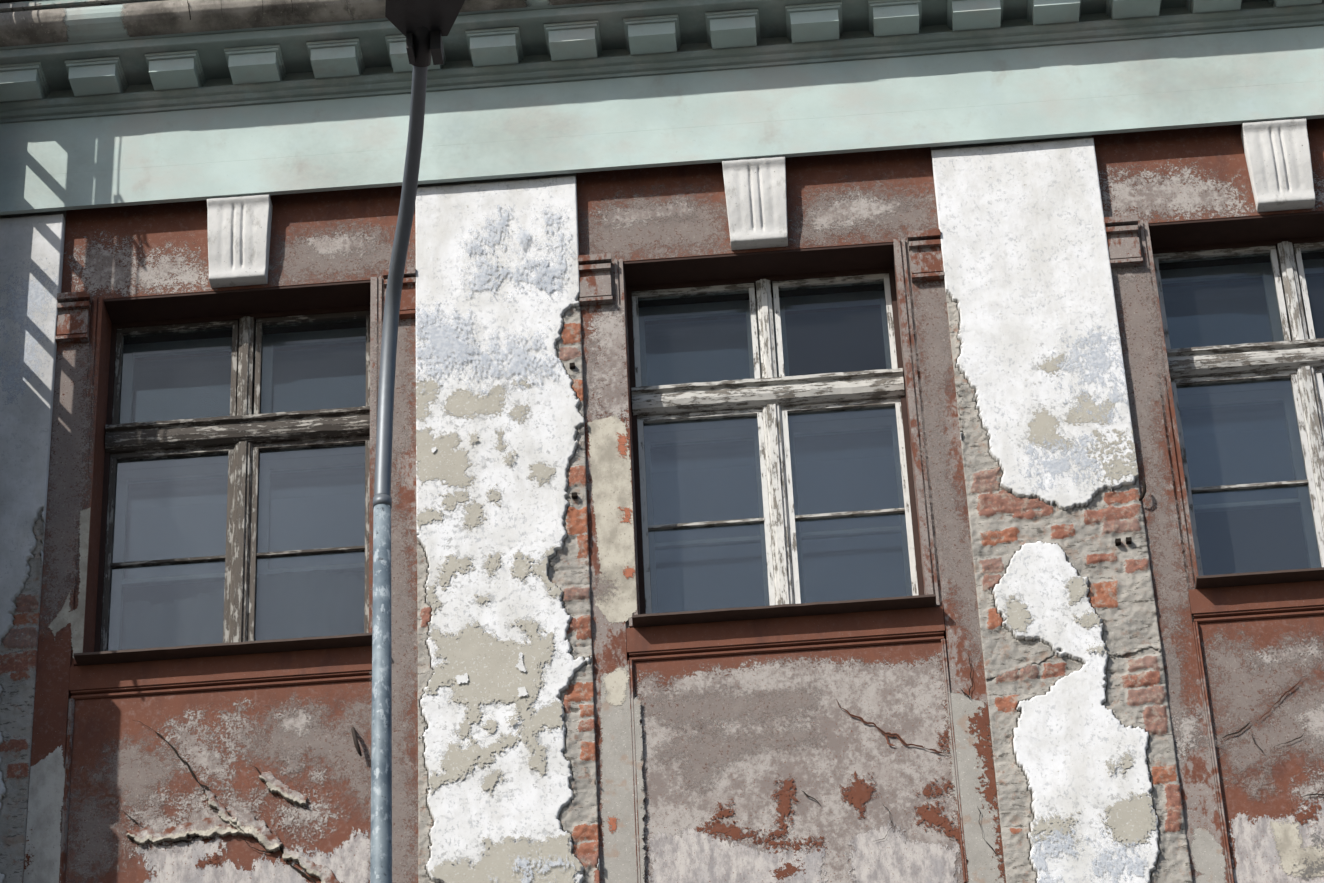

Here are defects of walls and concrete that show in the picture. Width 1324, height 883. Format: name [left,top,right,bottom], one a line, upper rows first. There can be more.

peeling [1098,158,1262,222]
peeling [1309,161,1324,211]
peeling [265,219,416,286]
spalling [0,227,372,883]
peeling [370,175,1324,883]
crack [139,721,209,791]
crack [836,699,950,753]
crack [116,808,316,883]